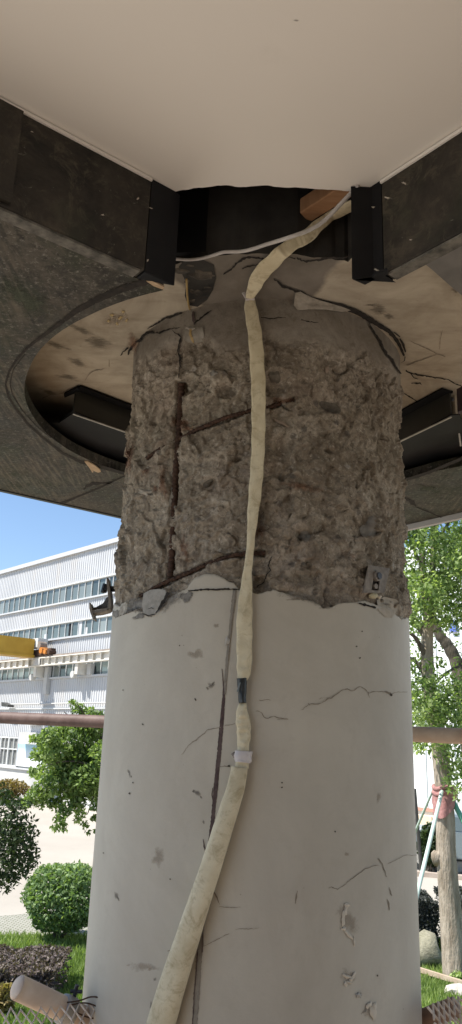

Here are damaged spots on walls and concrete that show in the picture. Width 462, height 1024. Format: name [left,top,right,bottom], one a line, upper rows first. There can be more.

crack [42,245,462,401]
spalling [114,298,412,619]
crack [259,686,396,720]
crack [330,855,413,890]